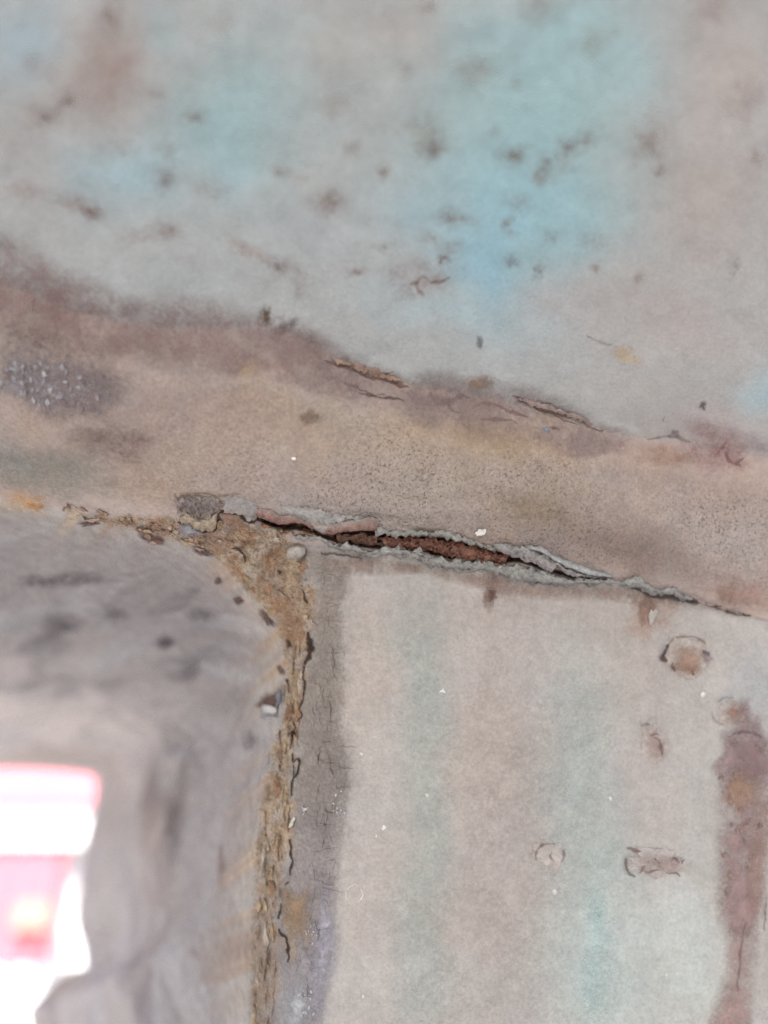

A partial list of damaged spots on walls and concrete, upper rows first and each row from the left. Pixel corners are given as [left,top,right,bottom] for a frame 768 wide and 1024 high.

rust [62,503,248,562]
peeling [174,492,310,534]
crack [256,504,751,617]
rust [251,589,315,1024]
crack [277,632,314,962]